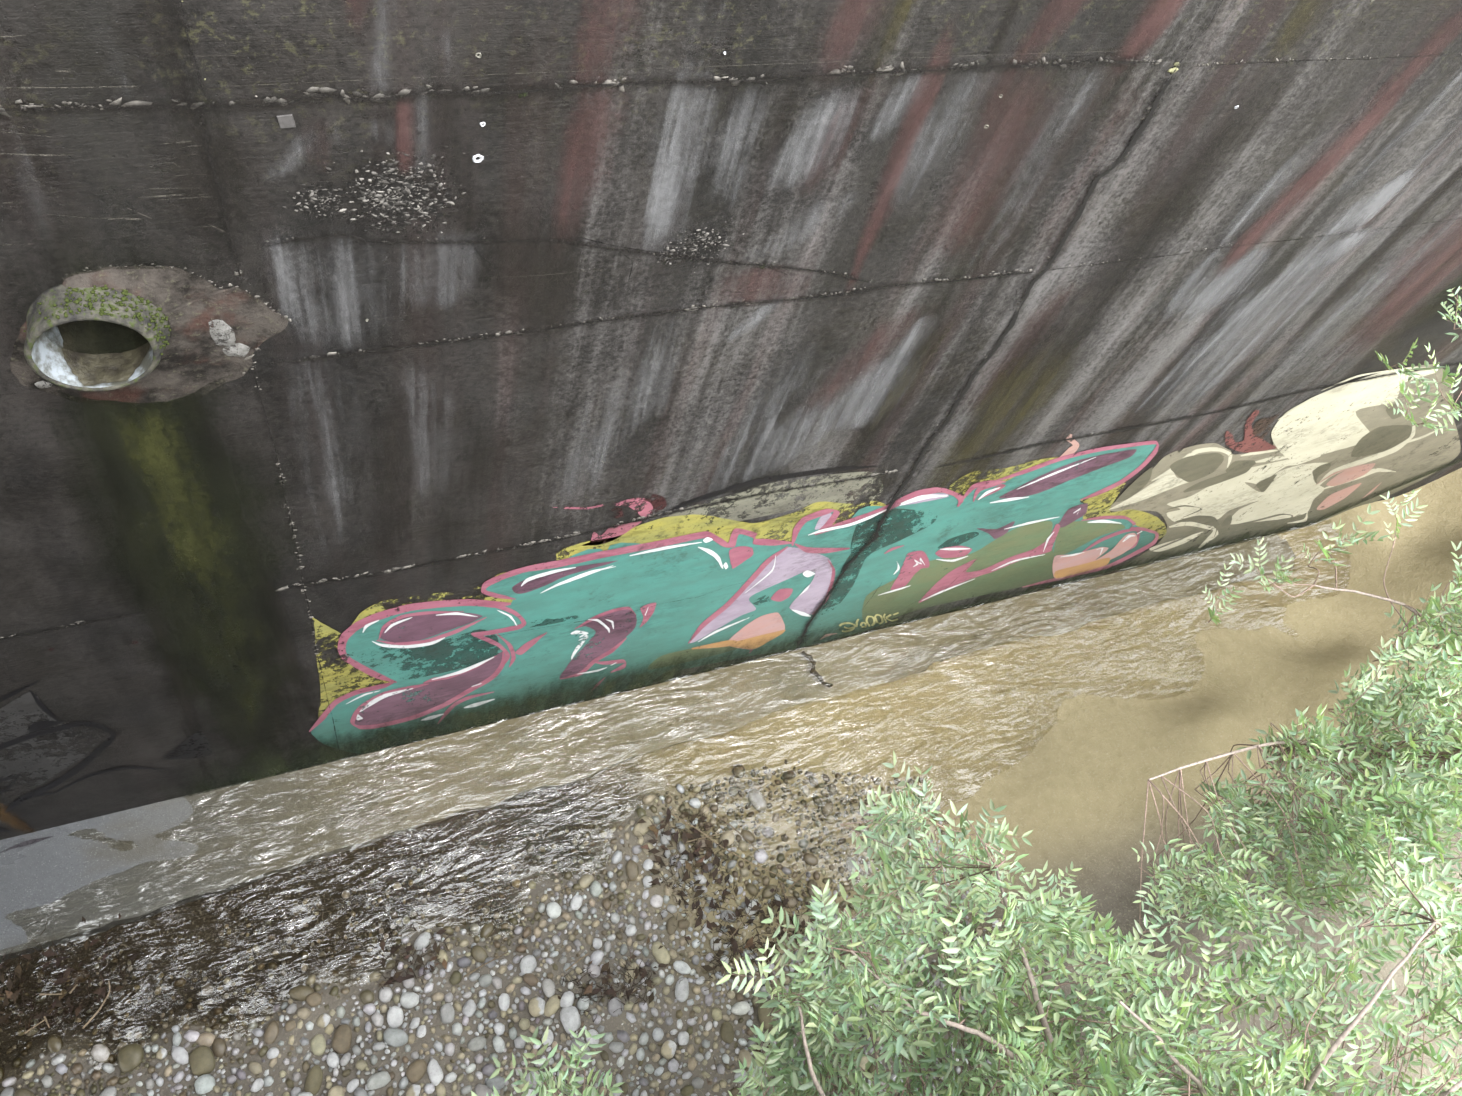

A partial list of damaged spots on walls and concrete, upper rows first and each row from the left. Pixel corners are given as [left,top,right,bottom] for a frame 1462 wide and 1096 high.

damp [782,104,844,177]
flaking render [293,146,466,238]
damp [825,311,939,431]